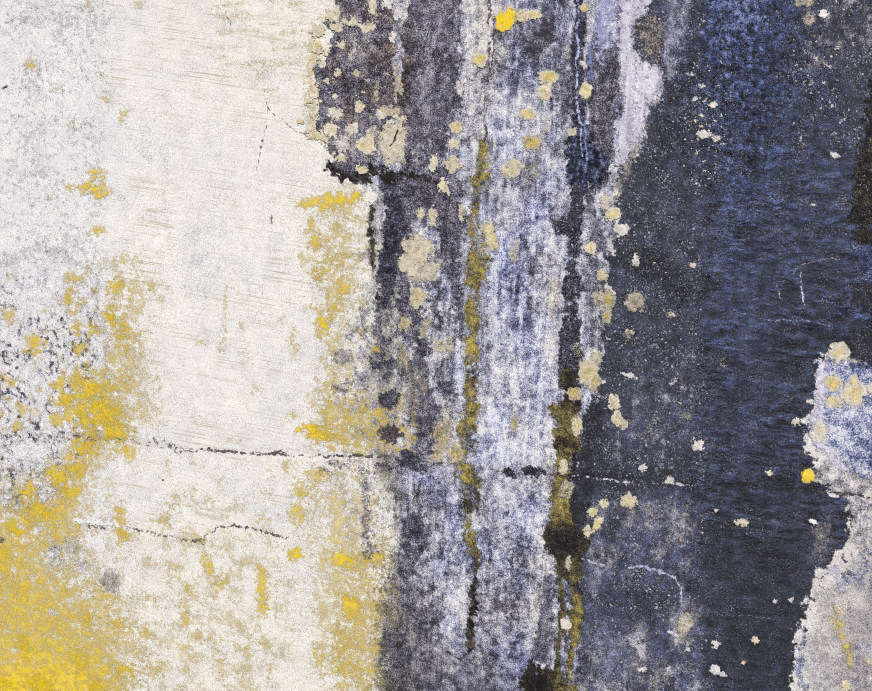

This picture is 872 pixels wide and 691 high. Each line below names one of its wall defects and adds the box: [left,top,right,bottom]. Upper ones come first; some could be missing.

crack [1,434,870,546]
water stain [278,0,872,691]